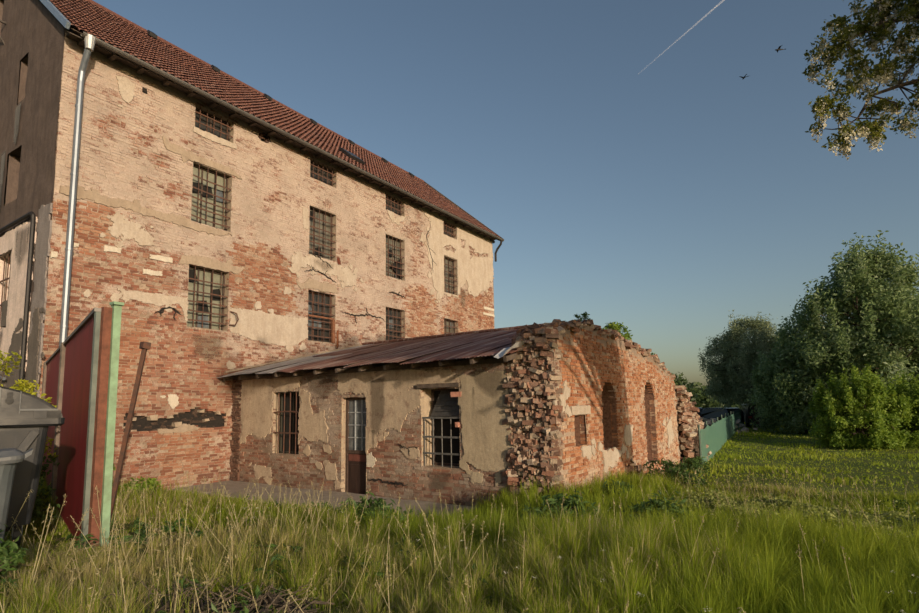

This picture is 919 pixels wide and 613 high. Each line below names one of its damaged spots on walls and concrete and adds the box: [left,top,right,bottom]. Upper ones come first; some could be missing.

flaking render [51,185,161,256]
crack [154,306,181,320]
flaking render [403,285,494,338]
flaking render [553,380,572,417]
flaking render [459,459,484,483]